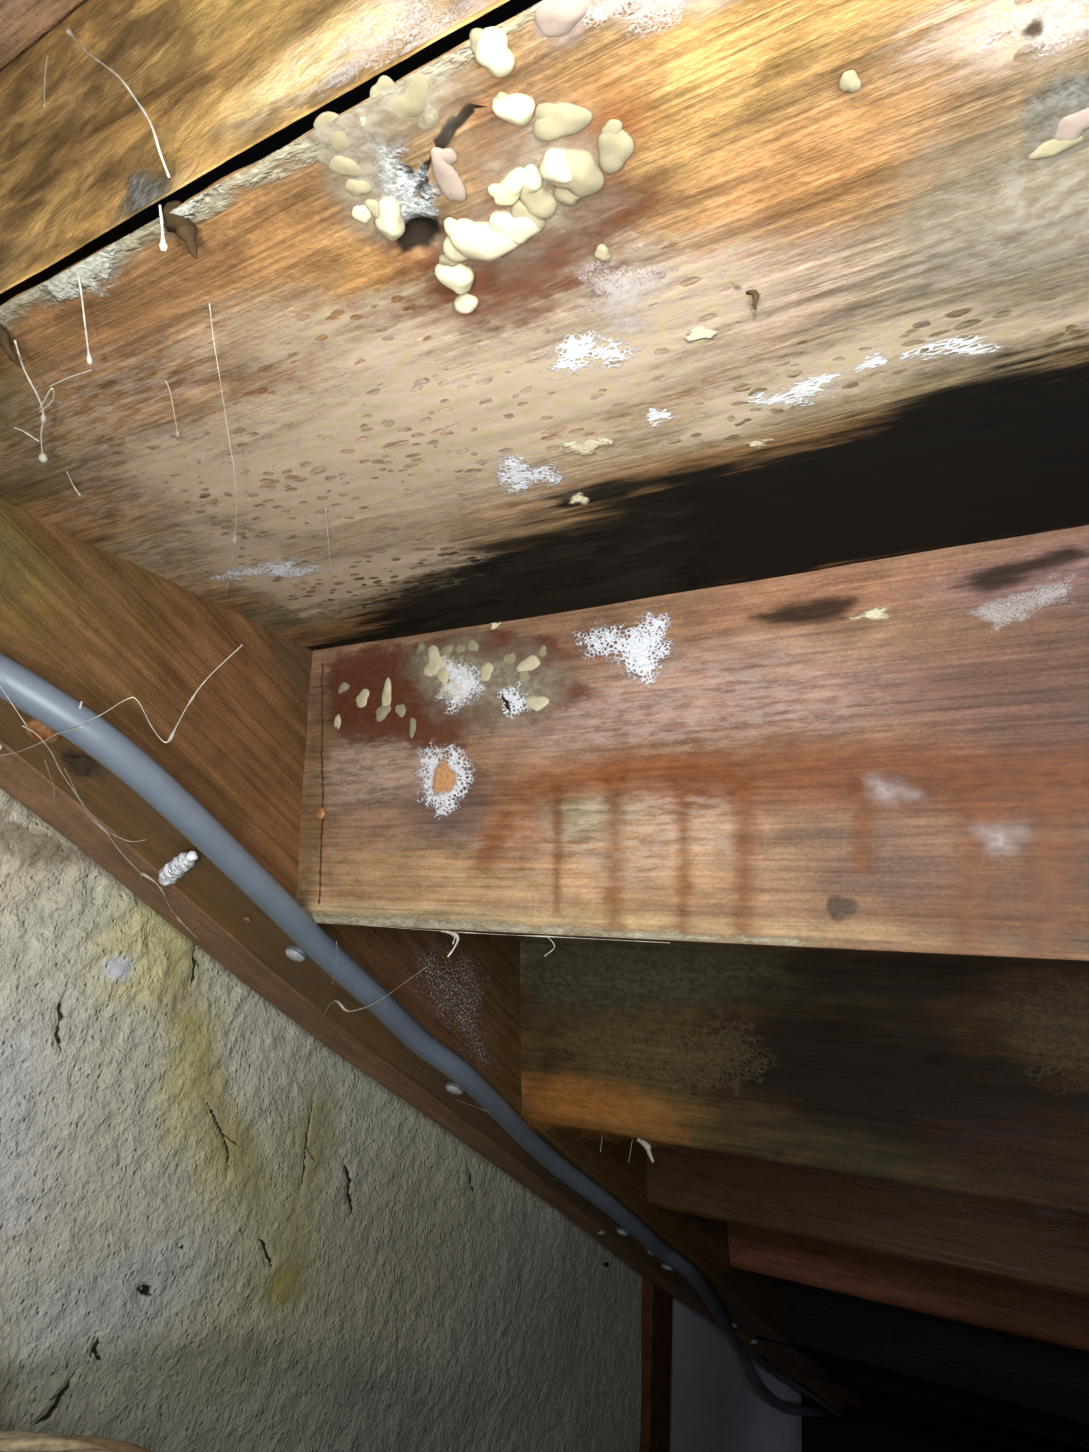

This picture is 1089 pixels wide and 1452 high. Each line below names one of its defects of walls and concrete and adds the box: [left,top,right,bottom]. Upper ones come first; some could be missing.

leakage [118,76,1089,820]
crack [54,991,66,1052]
crack [204,1097,237,1175]
crack [300,1095,352,1215]